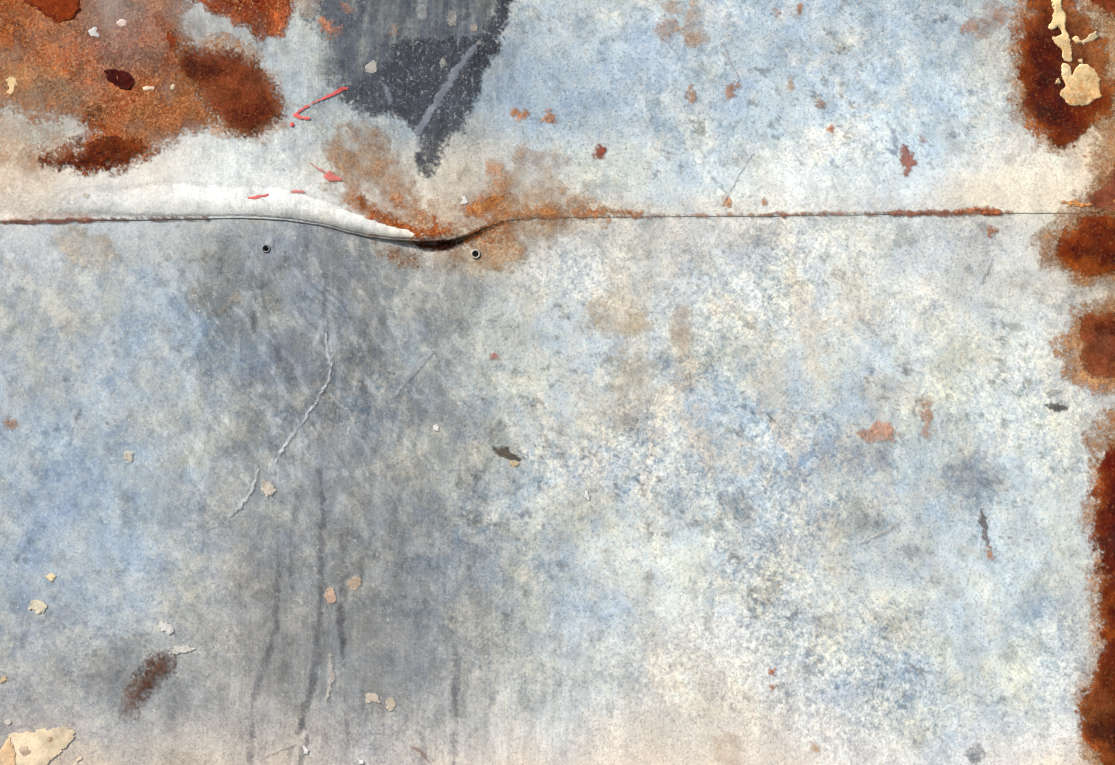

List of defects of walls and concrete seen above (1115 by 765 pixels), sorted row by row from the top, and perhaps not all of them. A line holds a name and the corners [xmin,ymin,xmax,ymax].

rust [0,0,298,176]
rust [327,128,643,271]
rust [993,0,1115,287]
rust [1049,300,1115,395]
rust [1074,409,1115,765]
peeling [0,719,75,765]